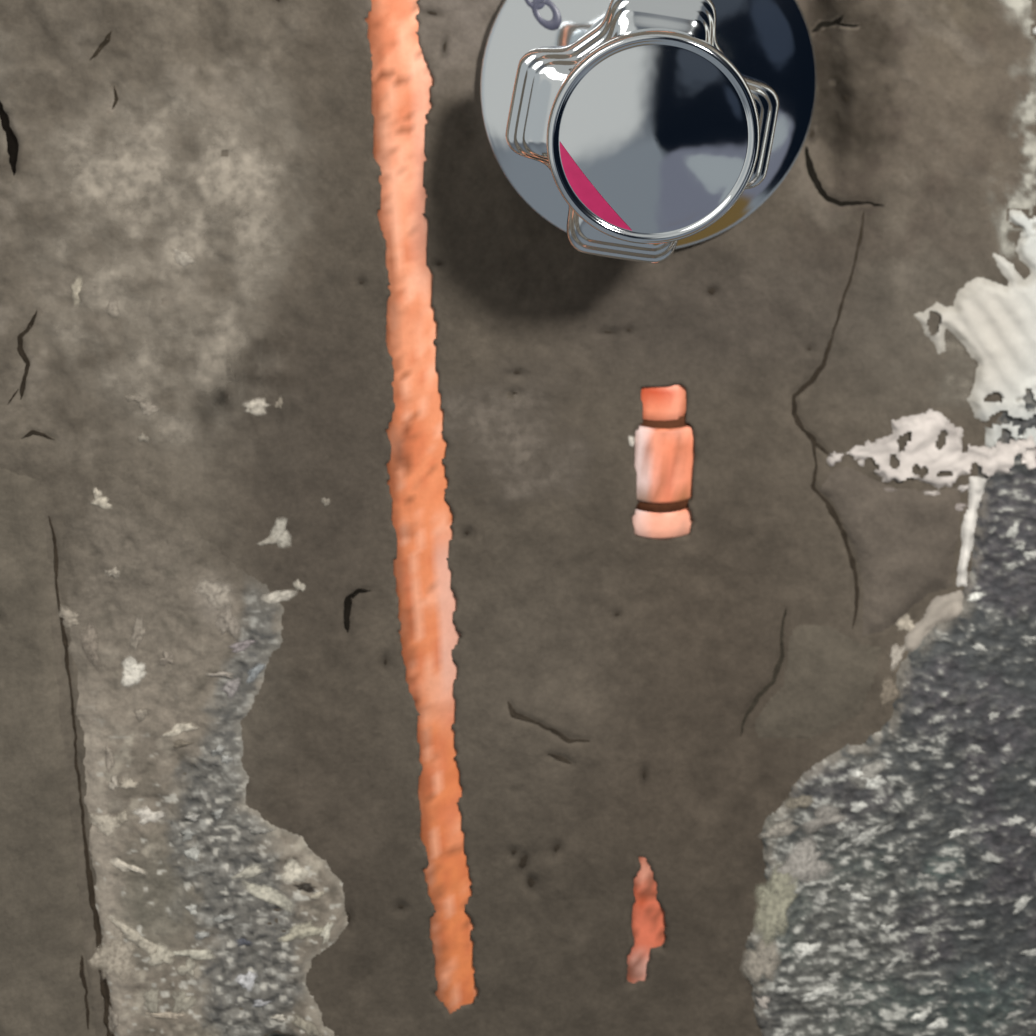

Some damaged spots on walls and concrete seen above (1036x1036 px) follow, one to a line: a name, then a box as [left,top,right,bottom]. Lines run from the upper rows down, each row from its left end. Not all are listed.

crack [811,14,861,32]
crack [0,102,19,175]
crack [8,311,37,404]
crack [792,146,884,629]
spalling [996,388,1036,444]
peeling [827,451,844,466]
crack [344,588,372,633]
crack [49,516,114,1036]
peeling [59,469,350,1036]
crack [507,702,590,764]
spalling [743,454,1036,1036]